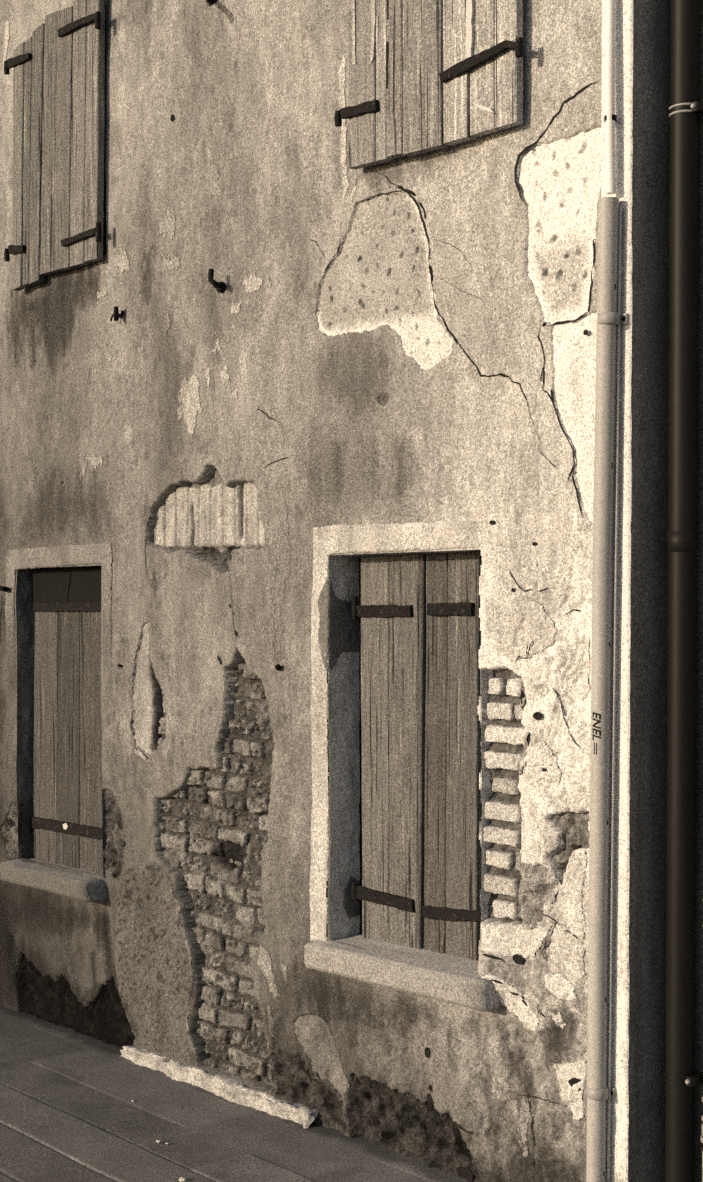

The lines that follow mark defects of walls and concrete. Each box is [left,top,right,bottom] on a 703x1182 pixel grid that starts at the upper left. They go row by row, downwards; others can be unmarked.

spalling [317,0,453,370]
crack [311,167,595,518]
crack [514,81,598,203]
spalling [518,128,601,522]
spalling [133,623,167,760]
spalling [154,468,290,646]
spalling [159,662,475,1182]
spalling [481,588,590,1033]